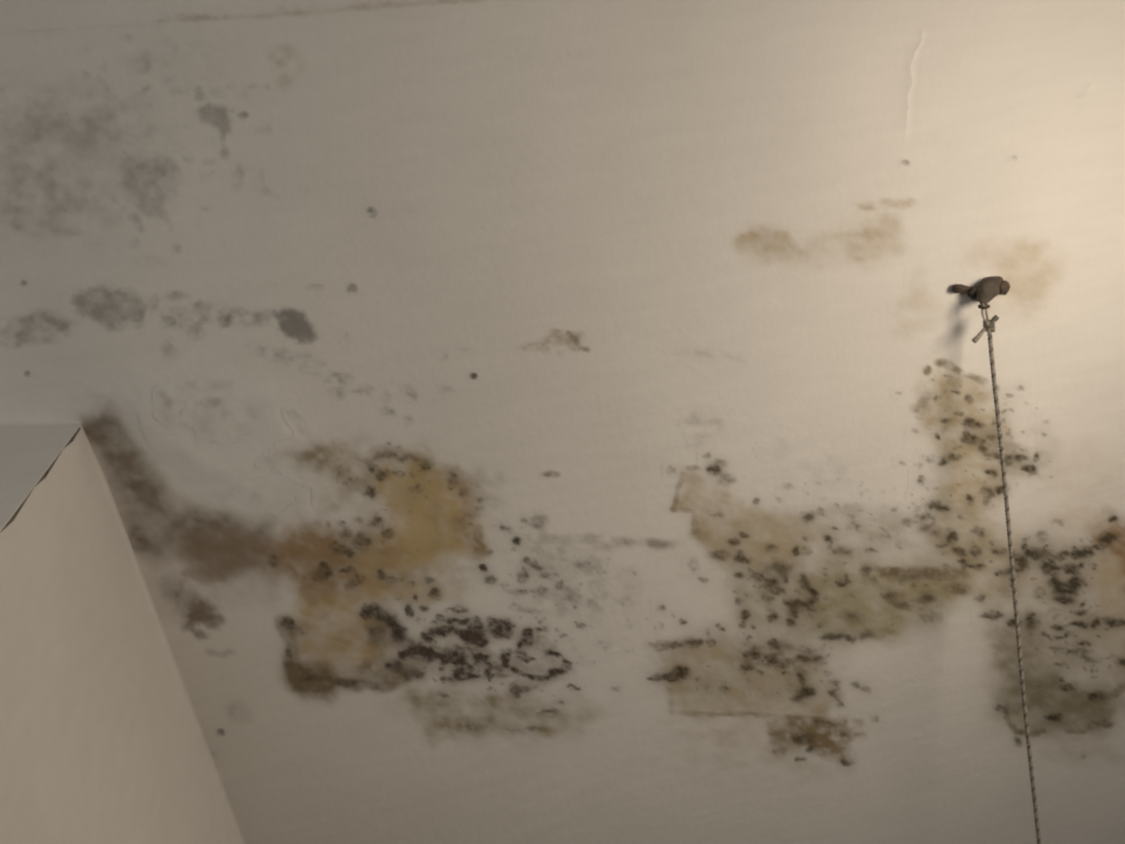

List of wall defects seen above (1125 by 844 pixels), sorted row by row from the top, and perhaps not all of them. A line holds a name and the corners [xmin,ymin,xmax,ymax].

mould [0,21,283,273]
damp [69,349,1125,797]